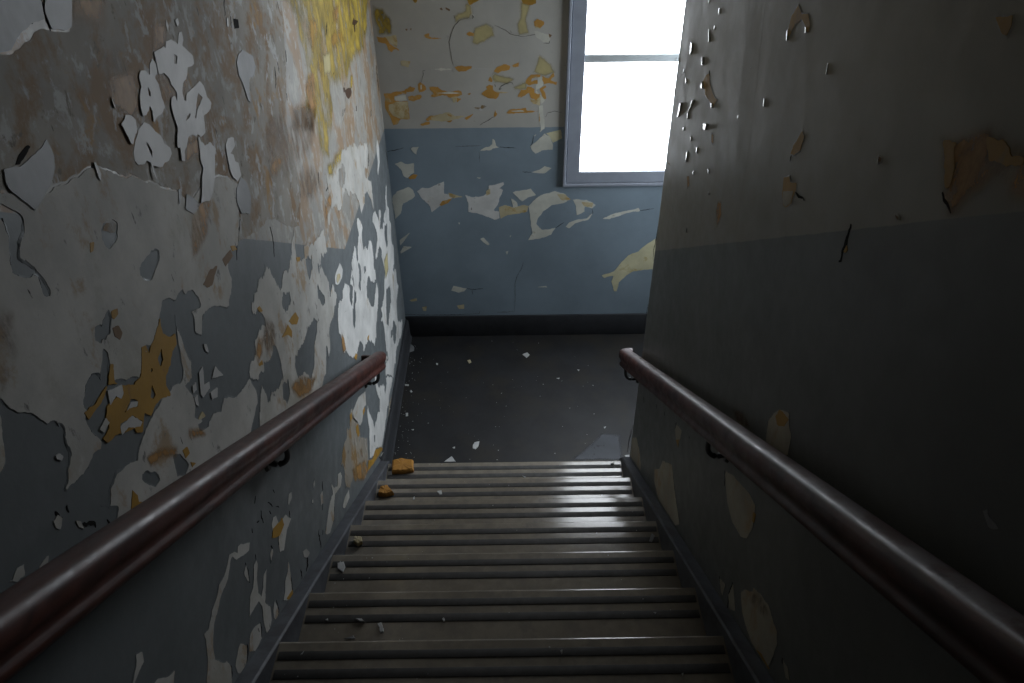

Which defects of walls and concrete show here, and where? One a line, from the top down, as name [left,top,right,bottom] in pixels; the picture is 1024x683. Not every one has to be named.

peeling [786,4,811,41]
peeling [688,71,717,112]
crack [838,224,852,262]
peeling [0,0,656,535]
peeling [203,491,293,683]